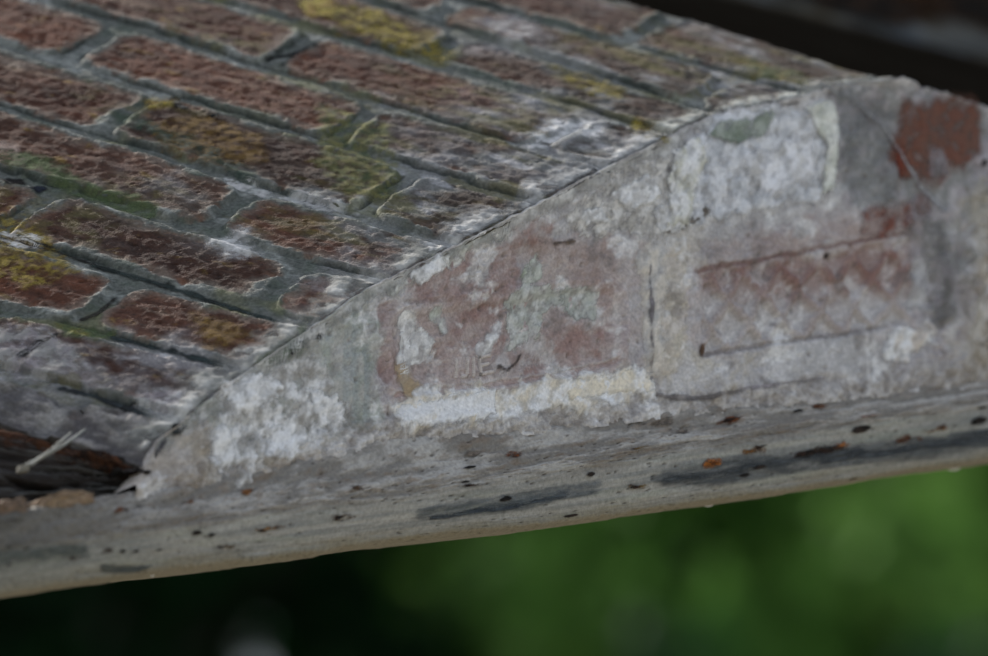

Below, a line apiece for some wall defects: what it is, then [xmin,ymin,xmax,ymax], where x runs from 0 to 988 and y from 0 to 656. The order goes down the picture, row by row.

spalling [862,96,981,238]
corrosion [897,424,947,443]
corrosion [703,458,722,468]
leakage [654,430,988,485]
corrosion [796,441,850,457]